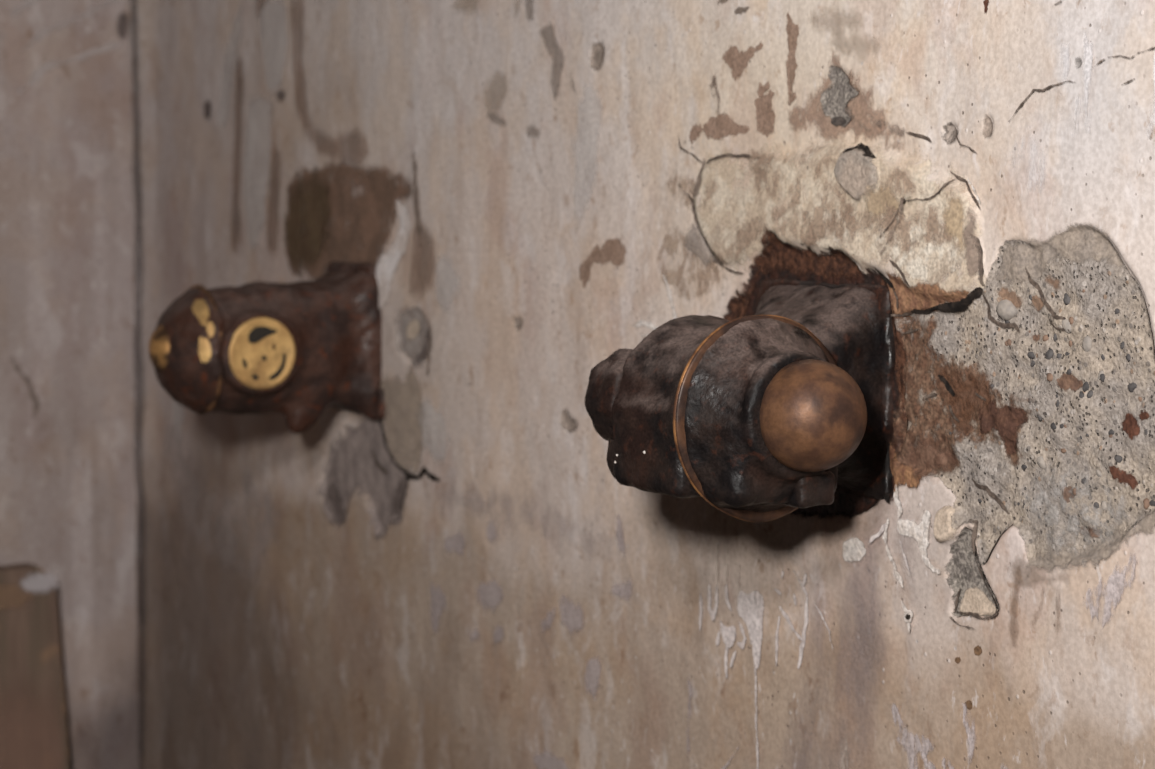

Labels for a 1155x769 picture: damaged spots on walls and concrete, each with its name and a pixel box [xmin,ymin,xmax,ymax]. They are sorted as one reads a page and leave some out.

peeling [689,82,775,144]
peeling [723,42,763,80]
peeling [786,13,890,146]
crack [1009,80,1071,121]
crack [1097,47,1155,84]
crack [678,138,773,274]
crack [842,107,1019,334]
spalling [318,307,431,539]
corrosion [723,229,1028,519]
crack [925,375,986,422]
spalling [897,224,1155,617]